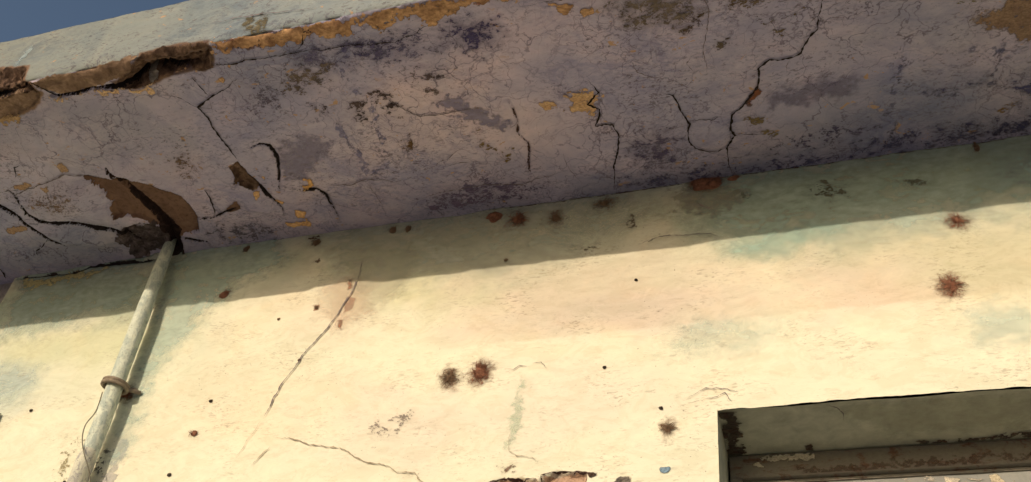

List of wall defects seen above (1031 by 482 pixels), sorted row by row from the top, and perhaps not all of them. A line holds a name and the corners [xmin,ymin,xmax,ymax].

spalling [0,0,509,126]
crack [631,0,837,179]
crack [167,24,430,216]
rust [688,174,740,192]
crack [0,166,153,279]
flaking render [83,175,199,259]
rust [944,209,971,229]
rust [934,273,969,300]
rust [437,356,494,389]
crack [490,434,598,482]
flaking render [491,464,597,482]
peeling [924,474,1015,482]